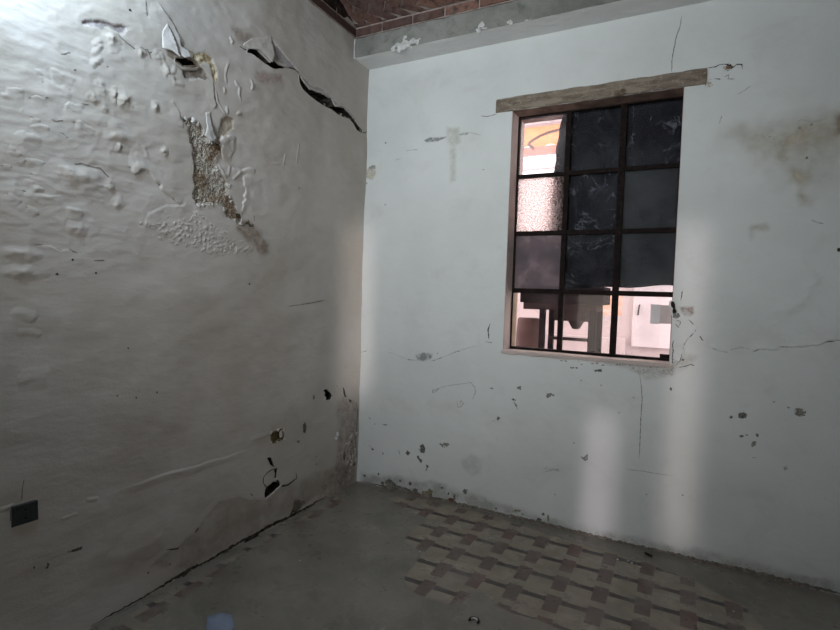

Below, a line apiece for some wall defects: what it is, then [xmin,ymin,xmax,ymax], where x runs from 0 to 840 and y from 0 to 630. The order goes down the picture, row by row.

crack [240,36,366,135]
crack [709,63,743,79]
flaking render [1,0,264,263]
crack [670,319,703,367]
crack [637,379,645,455]
hole [251,456,297,502]